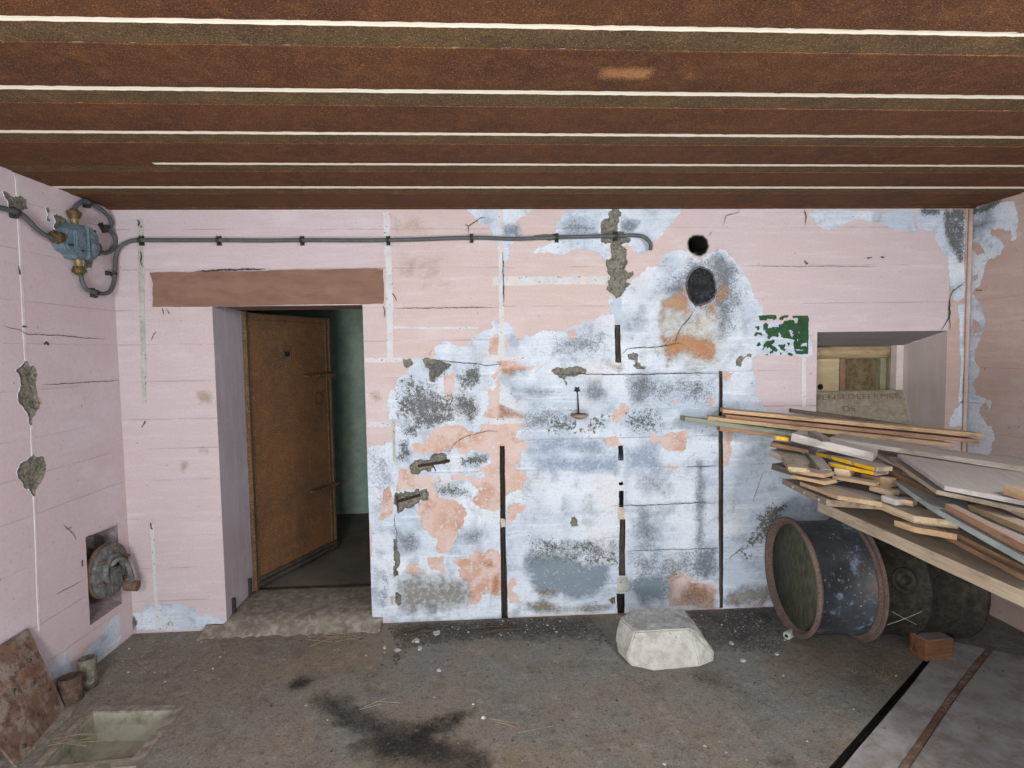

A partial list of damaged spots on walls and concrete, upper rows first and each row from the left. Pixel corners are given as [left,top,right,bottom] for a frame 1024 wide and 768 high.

crack [565,312,700,375]
peeling [809,201,1018,455]
crack [941,285,982,330]
spalling [16,361,40,426]
leakage [398,363,480,460]
peeling [367,209,825,623]
spalling [17,454,46,496]
leakage [399,581,466,612]